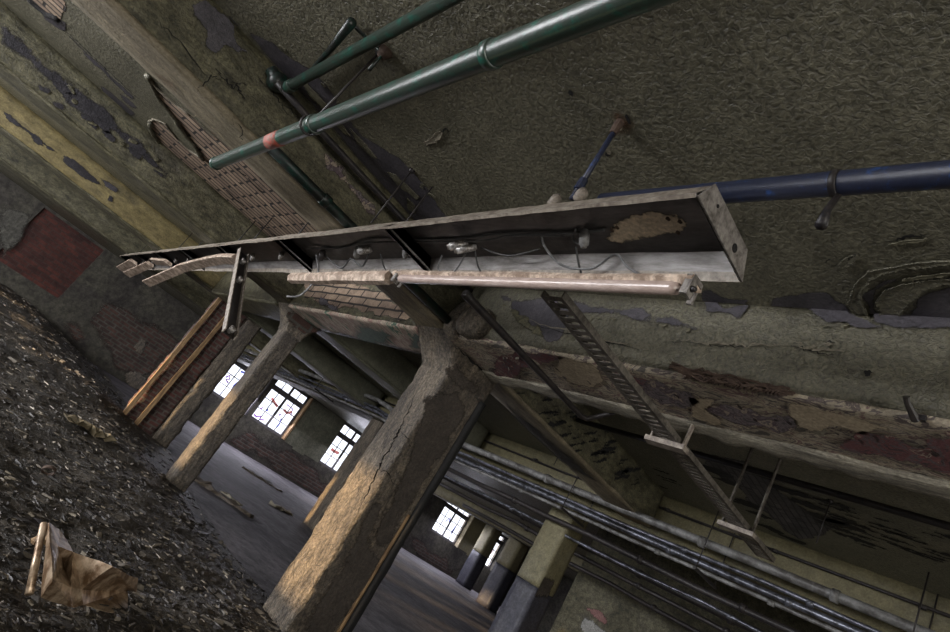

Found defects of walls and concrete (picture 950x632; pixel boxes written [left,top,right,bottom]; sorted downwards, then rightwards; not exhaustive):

peeling [1,26,176,182]
peeling [250,33,340,112]
peeling [4,112,118,202]
spalling [144,73,319,237]
peeling [333,121,447,220]
peeling [0,208,30,255]
peeling [771,260,950,329]
crack [354,392,415,521]
peeling [622,373,721,426]
peeling [788,403,950,476]